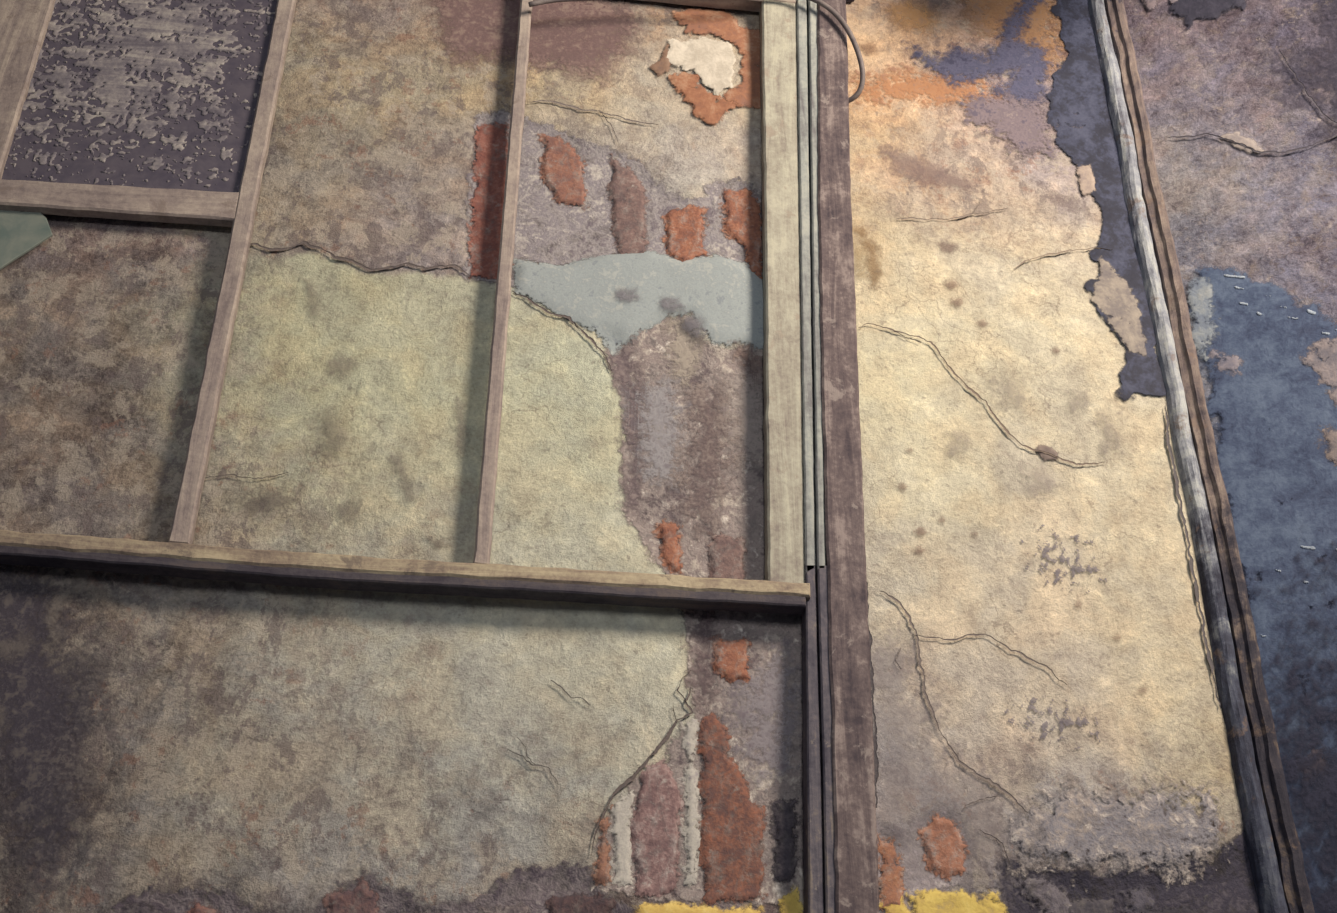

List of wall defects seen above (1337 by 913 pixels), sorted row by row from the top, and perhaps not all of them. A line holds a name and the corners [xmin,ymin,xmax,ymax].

crack [533,100,659,141]
peeling [650,8,761,125]
crack [1168,50,1337,154]
crack [250,240,474,277]
flaking render [459,109,763,287]
flaking render [604,298,765,580]
crack [858,323,1102,465]
flaking render [316,608,804,913]
crack [591,670,693,854]
crack [867,582,1067,863]
flaking render [98,885,276,913]
flaking render [876,806,973,912]